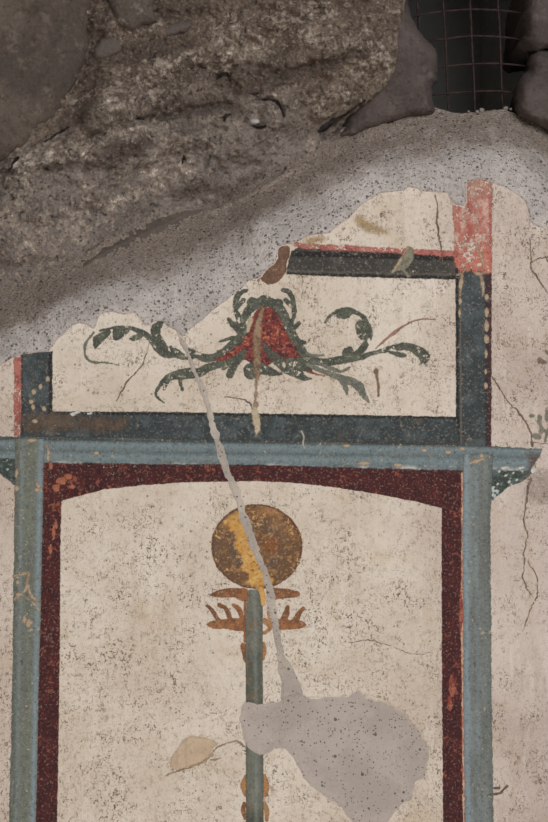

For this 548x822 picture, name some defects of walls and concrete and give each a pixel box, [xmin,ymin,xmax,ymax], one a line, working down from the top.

spalling [391,246,414,277]
crack [530,240,548,292]
peeling [456,245,489,358]
crack [492,377,547,447]
crack [176,331,303,703]
crack [522,478,538,623]
flaking render [170,736,218,770]